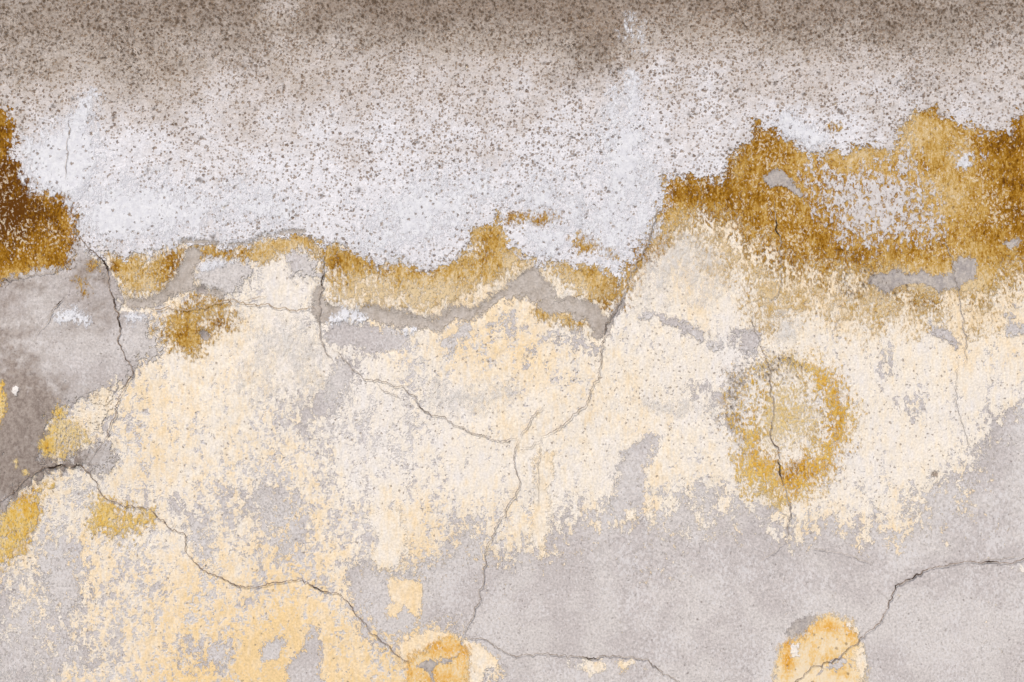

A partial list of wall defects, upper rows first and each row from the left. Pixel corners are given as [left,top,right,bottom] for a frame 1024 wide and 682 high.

crack [0,214,412,667]
crack [152,207,680,682]
leakage [0,0,1024,310]
flaking render [0,0,1024,442]
peeling [334,397,1024,682]
leakage [711,309,868,511]
crack [751,202,869,563]
crack [795,554,1024,682]